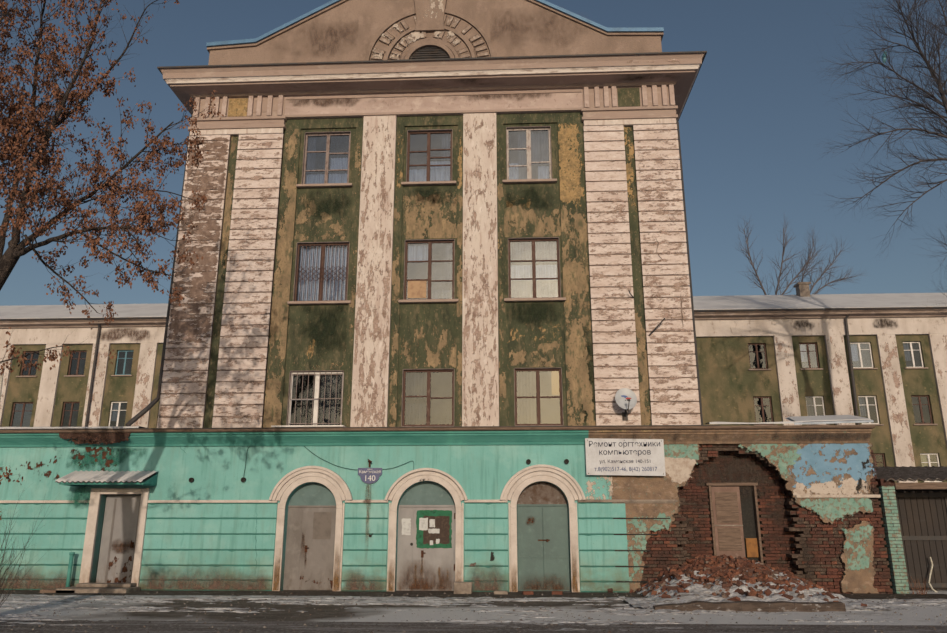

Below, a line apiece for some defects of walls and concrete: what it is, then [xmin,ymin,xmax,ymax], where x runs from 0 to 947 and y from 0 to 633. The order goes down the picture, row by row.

peeling [373,24,460,59]
peeling [330,116,698,432]
leakage [72,449,141,471]
leakage [71,485,90,507]
peeling [620,443,893,594]
rust [107,543,134,583]